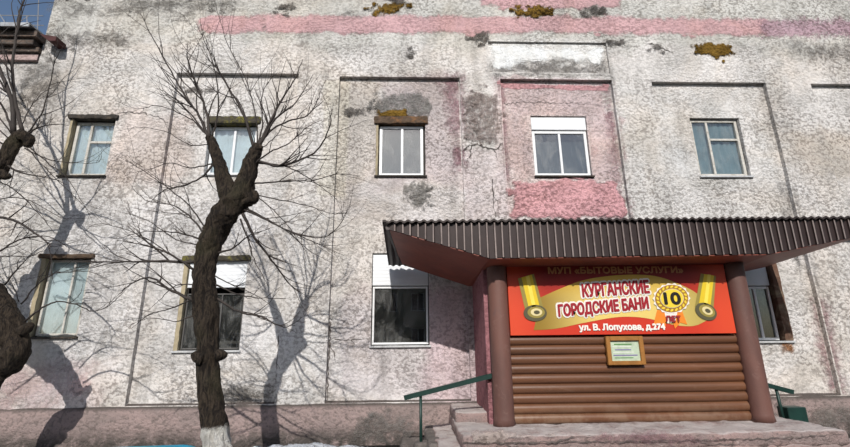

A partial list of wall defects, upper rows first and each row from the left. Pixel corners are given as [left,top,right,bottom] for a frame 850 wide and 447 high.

peeling [198,0,850,70]
spalling [343,92,432,117]
spalling [462,80,609,146]